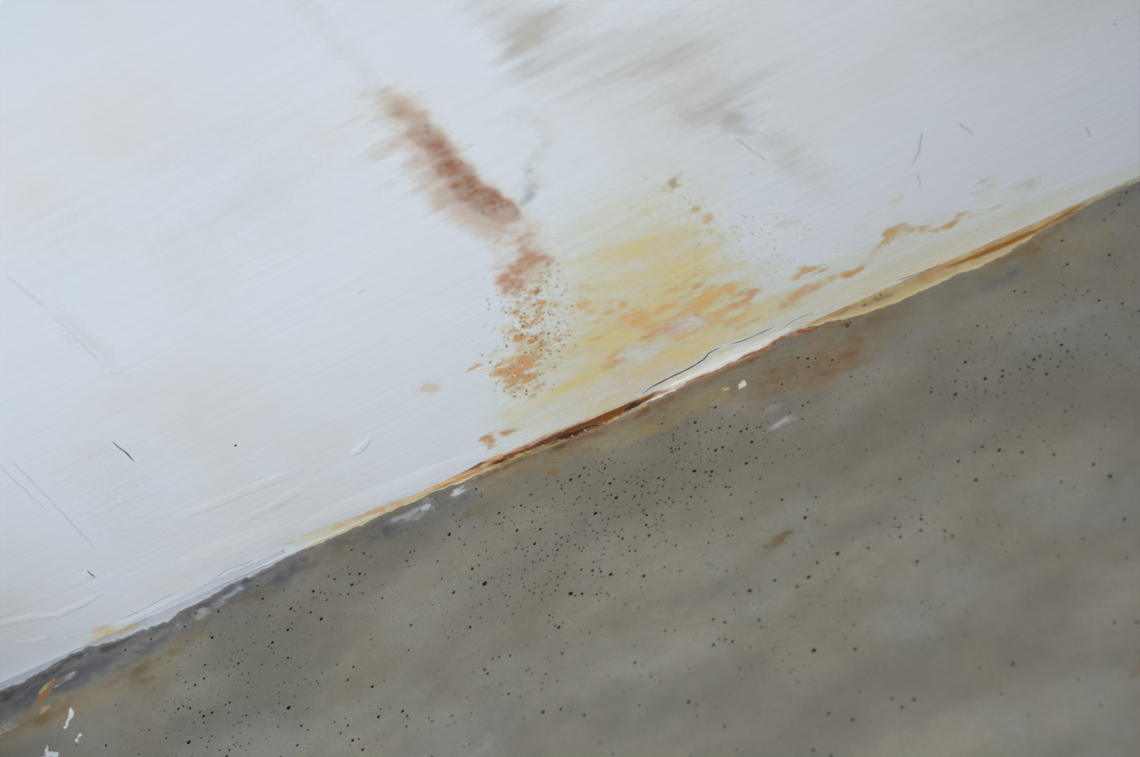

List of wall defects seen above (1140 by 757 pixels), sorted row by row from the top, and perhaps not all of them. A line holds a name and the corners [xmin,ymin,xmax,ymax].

rust [362,89,561,398]
rust [313,190,1096,536]
crack [641,311,817,395]